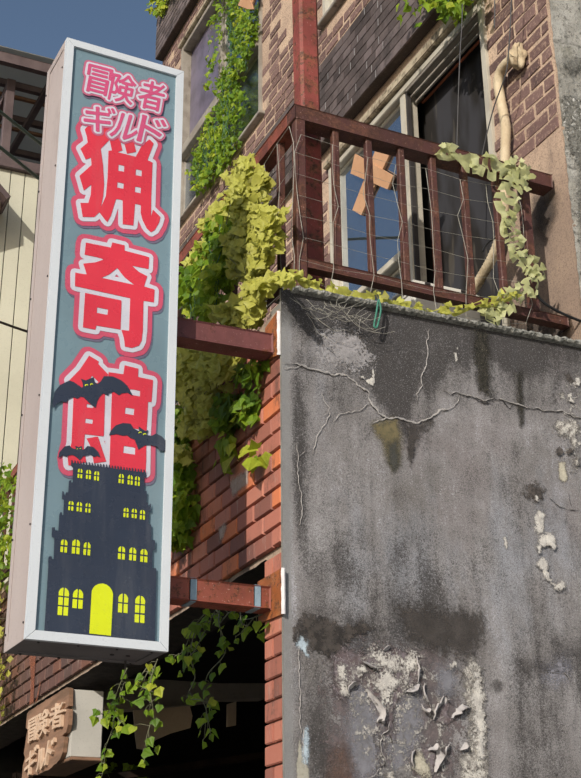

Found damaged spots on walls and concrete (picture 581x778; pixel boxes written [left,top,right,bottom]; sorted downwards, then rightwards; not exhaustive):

crack [416,334,429,398]
damp [473,330,494,400]
damp [373,417,434,471]
crack [284,363,581,526]
damp [516,372,525,428]
spalling [553,372,581,483]
damp [292,611,376,660]
damp [392,599,487,663]
peeling [318,633,491,778]
damp [302,726,310,765]